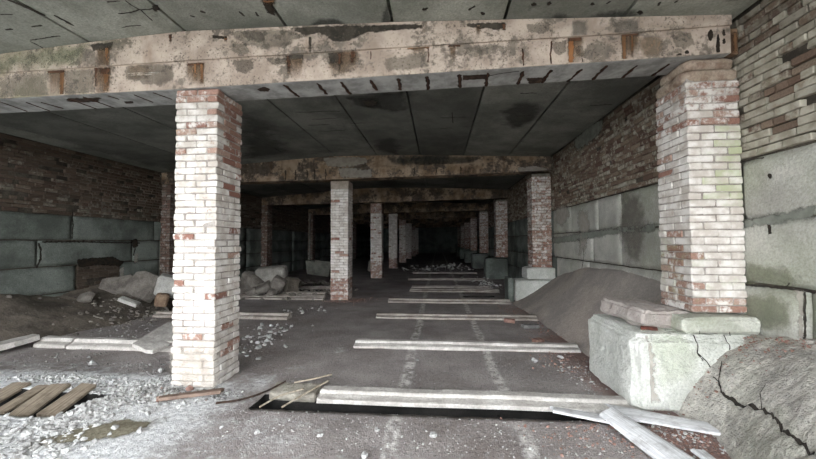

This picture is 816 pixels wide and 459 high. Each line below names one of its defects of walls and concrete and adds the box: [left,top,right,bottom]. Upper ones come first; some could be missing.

rust [48,70,65,94]
rust [94,67,111,91]
rust [187,63,204,83]
rust [286,54,303,71]
rust [568,37,582,63]
rust [622,33,661,59]
leakage [503,102,538,127]
crack [692,332,815,456]